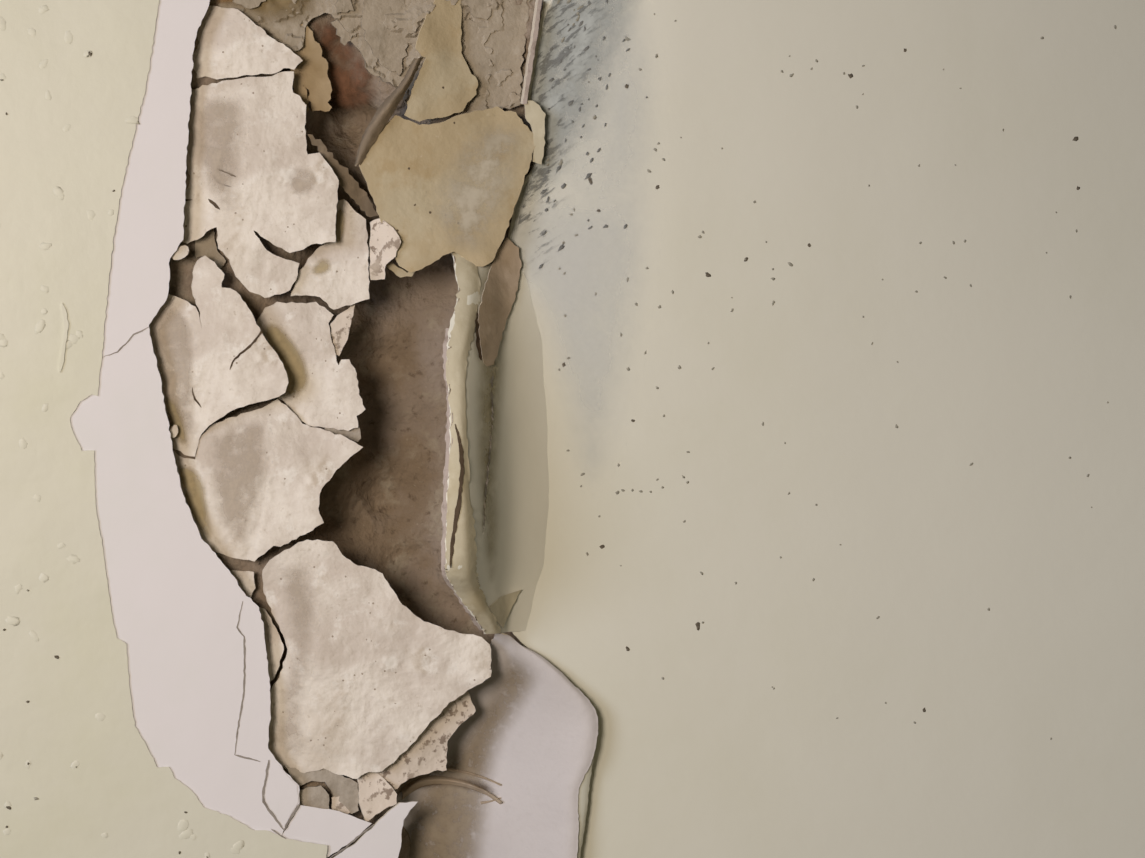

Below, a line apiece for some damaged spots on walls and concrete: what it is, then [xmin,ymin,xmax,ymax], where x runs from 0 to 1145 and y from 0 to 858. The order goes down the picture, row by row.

leakage [519,0,620,337]
peeling [70,0,598,858]
crack [234,601,300,839]